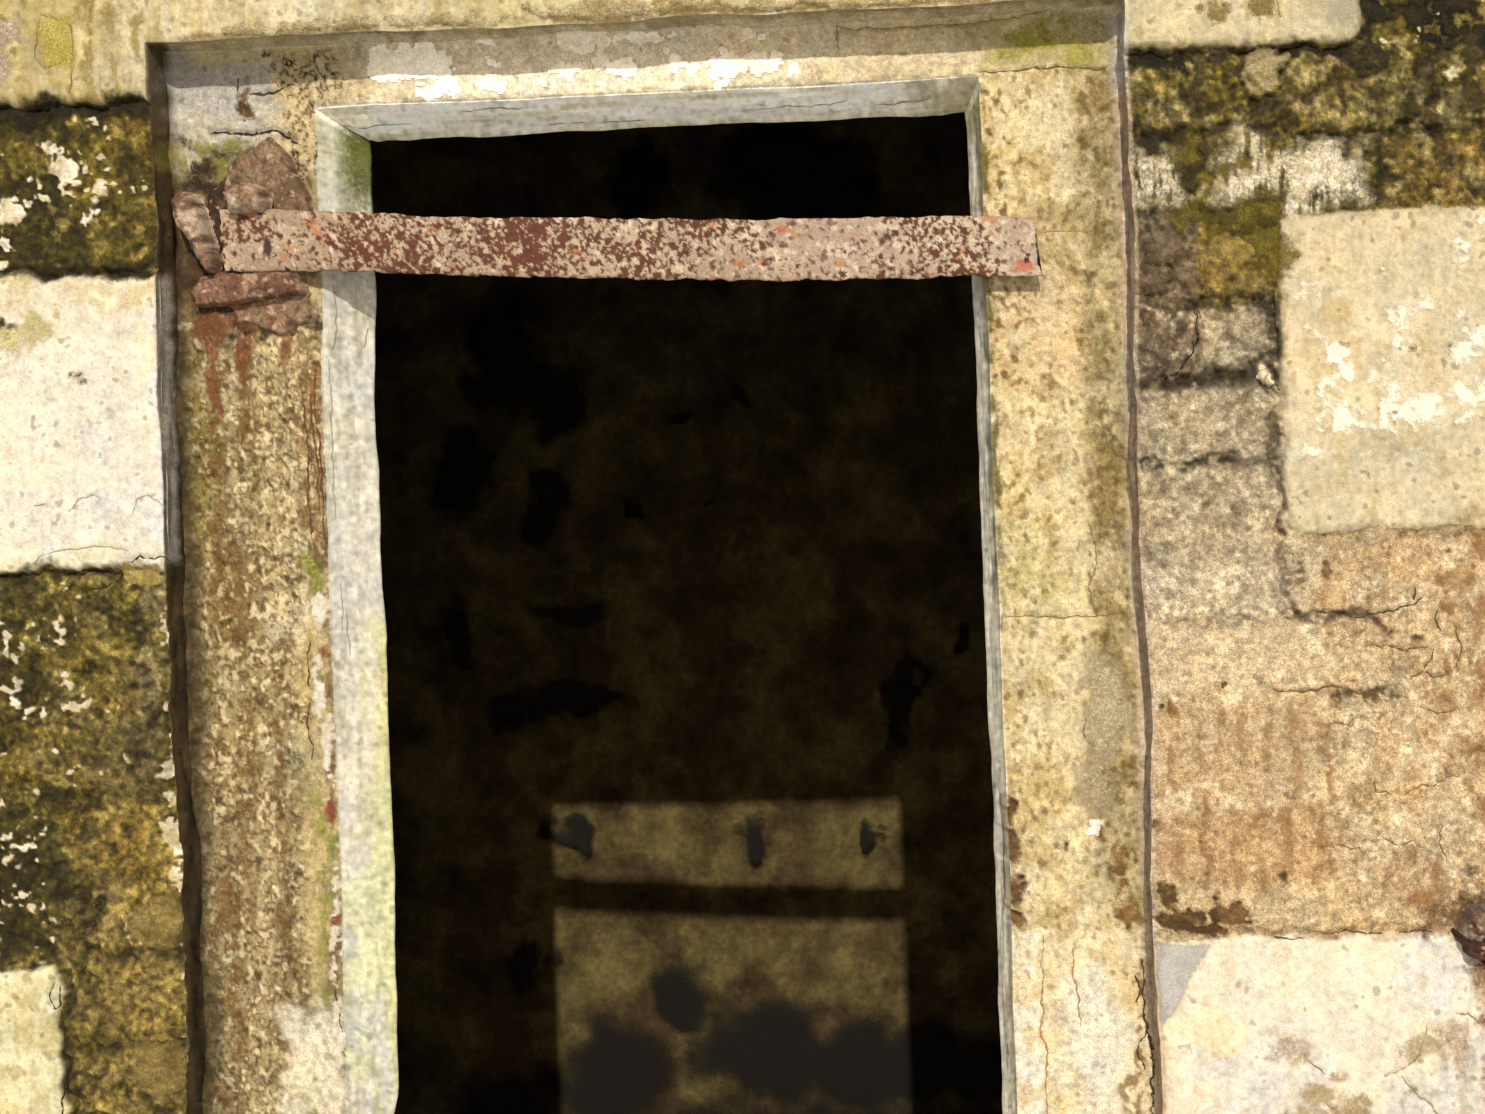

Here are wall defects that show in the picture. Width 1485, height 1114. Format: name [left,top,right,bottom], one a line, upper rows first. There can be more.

rust [181,138,254,220]
rust [175,239,323,418]
crack [1165,302,1199,379]
crack [1312,587,1463,714]
crack [1273,684,1360,738]
crack [1374,748,1485,795]
crack [1321,823,1447,859]
rust [1408,861,1485,939]
crack [1007,937,1082,1114]
crack [1134,959,1155,1114]
rust [1473,960,1485,1024]